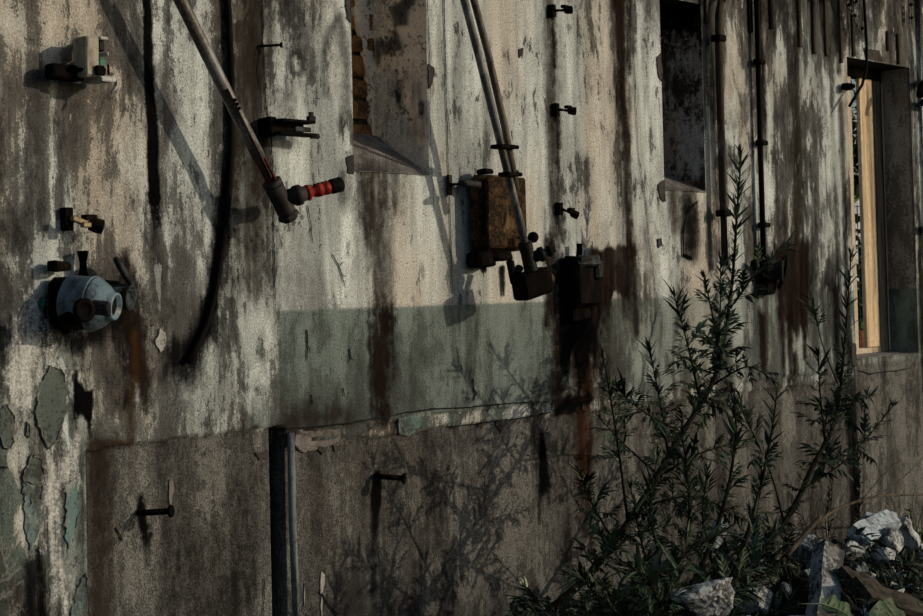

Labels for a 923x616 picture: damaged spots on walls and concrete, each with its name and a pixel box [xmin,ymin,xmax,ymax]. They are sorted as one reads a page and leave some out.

peeling [345,0,435,174]
water stain [544,0,565,328]
water stain [613,0,639,336]
water stain [787,6,804,277]
peeling [0,292,94,616]
spalling [295,428,343,455]
peeling [396,411,431,437]
rust [554,244,632,532]
rust [758,310,768,371]
rust [774,237,812,392]